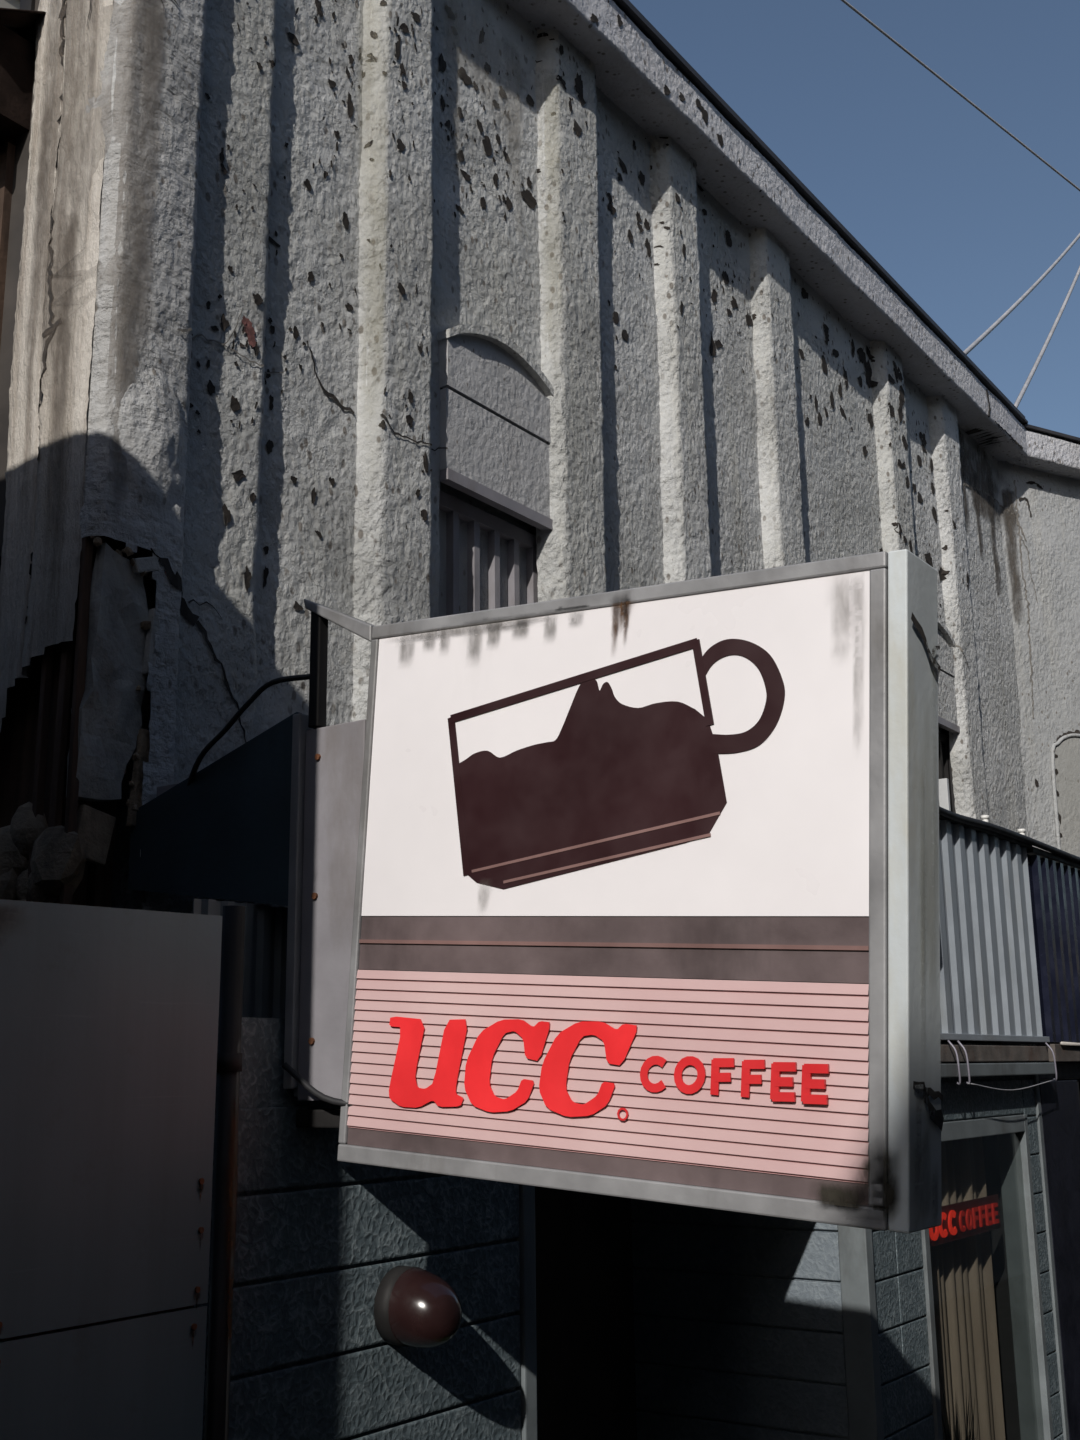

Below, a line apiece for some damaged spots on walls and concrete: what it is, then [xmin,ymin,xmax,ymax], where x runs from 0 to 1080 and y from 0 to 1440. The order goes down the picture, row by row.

spalling [0,536,160,908]
crack [125,548,246,743]